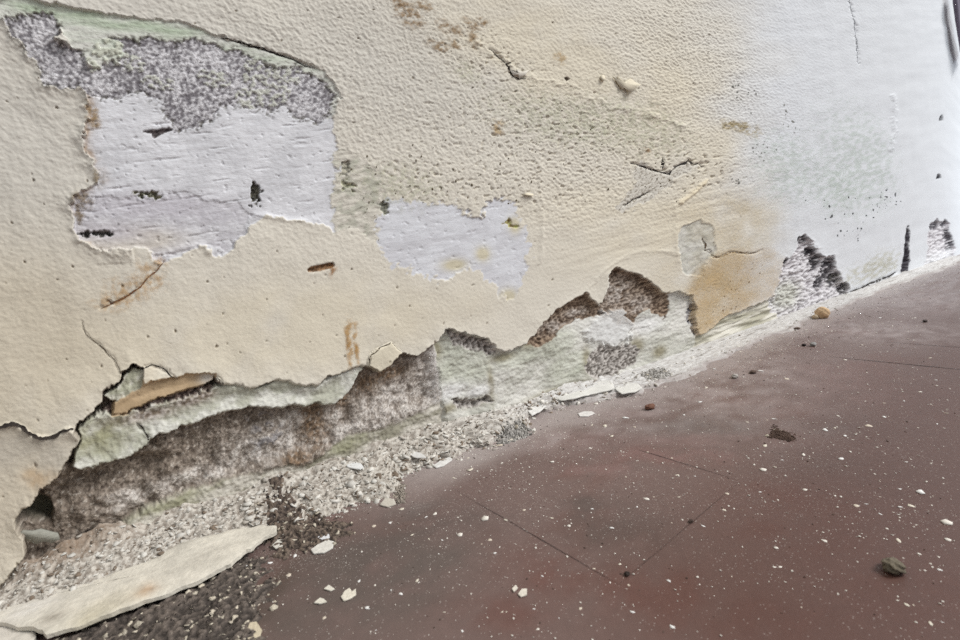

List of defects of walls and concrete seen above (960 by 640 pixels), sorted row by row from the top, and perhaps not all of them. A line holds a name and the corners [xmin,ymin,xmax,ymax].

peeling [0,0,535,301]
peeling [678,220,717,276]
flaking render [925,220,955,264]
crack [103,262,164,308]
flaking render [15,235,849,561]
crack [0,422,73,440]
peeling [314,585,356,604]